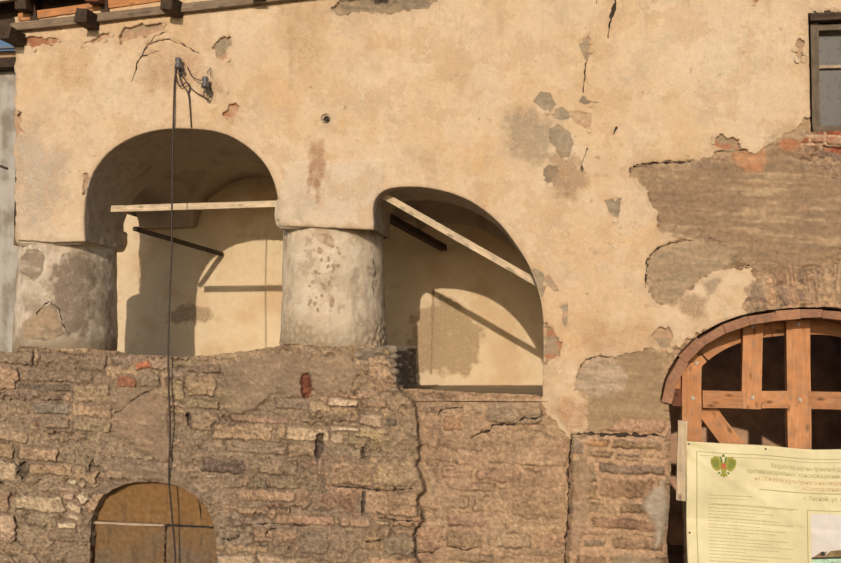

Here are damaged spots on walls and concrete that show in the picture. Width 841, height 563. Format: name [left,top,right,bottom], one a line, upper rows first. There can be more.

flaking render [92,22,166,44]
flaking render [331,0,438,16]
crack [588,0,616,39]
flaking render [213,34,232,62]
flaking render [223,104,239,123]
flaking render [533,91,599,189]
flaking render [20,248,45,281]
flaking render [532,268,559,300]
leakage [171,305,209,323]
flaking render [558,301,572,327]
flaking render [544,322,563,365]
flaking render [651,327,674,353]